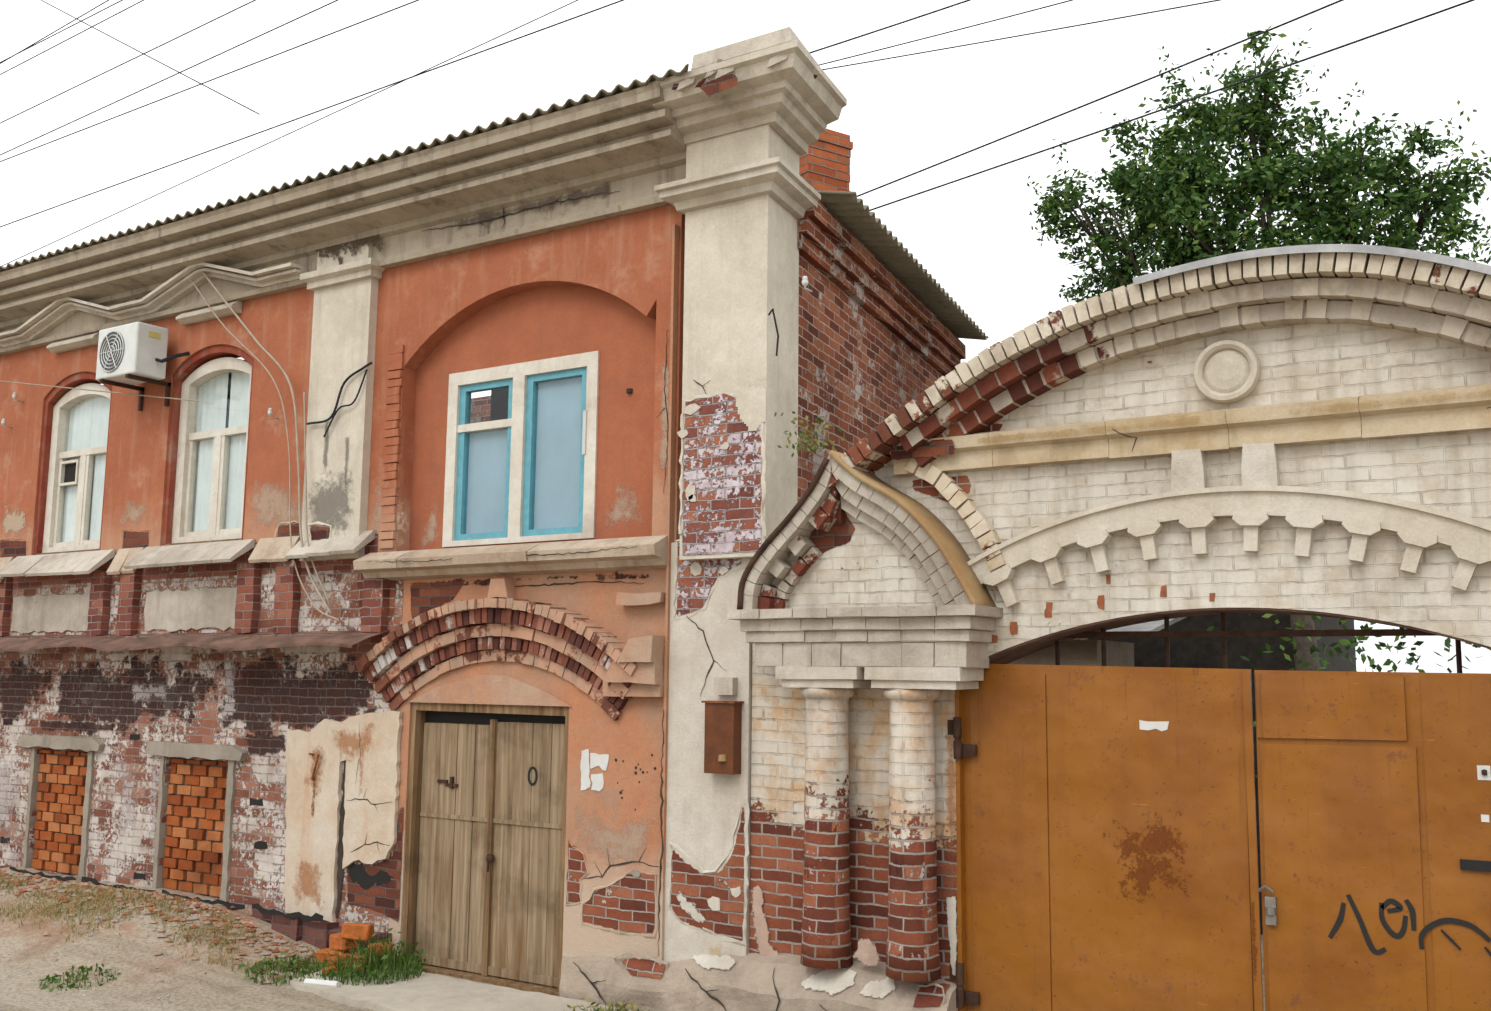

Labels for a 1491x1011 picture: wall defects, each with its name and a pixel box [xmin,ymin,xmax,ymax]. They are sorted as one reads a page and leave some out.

spalling [672,385,766,621]
crack [686,616,725,696]
flaking render [254,711,403,974]
crack [335,736,390,919]
crack [573,962,606,1002]
crack [583,709,726,1011]
spalling [565,782,779,979]
crack [772,968,780,1011]
flaking render [801,848,957,1007]
rust [1103,812,1192,901]